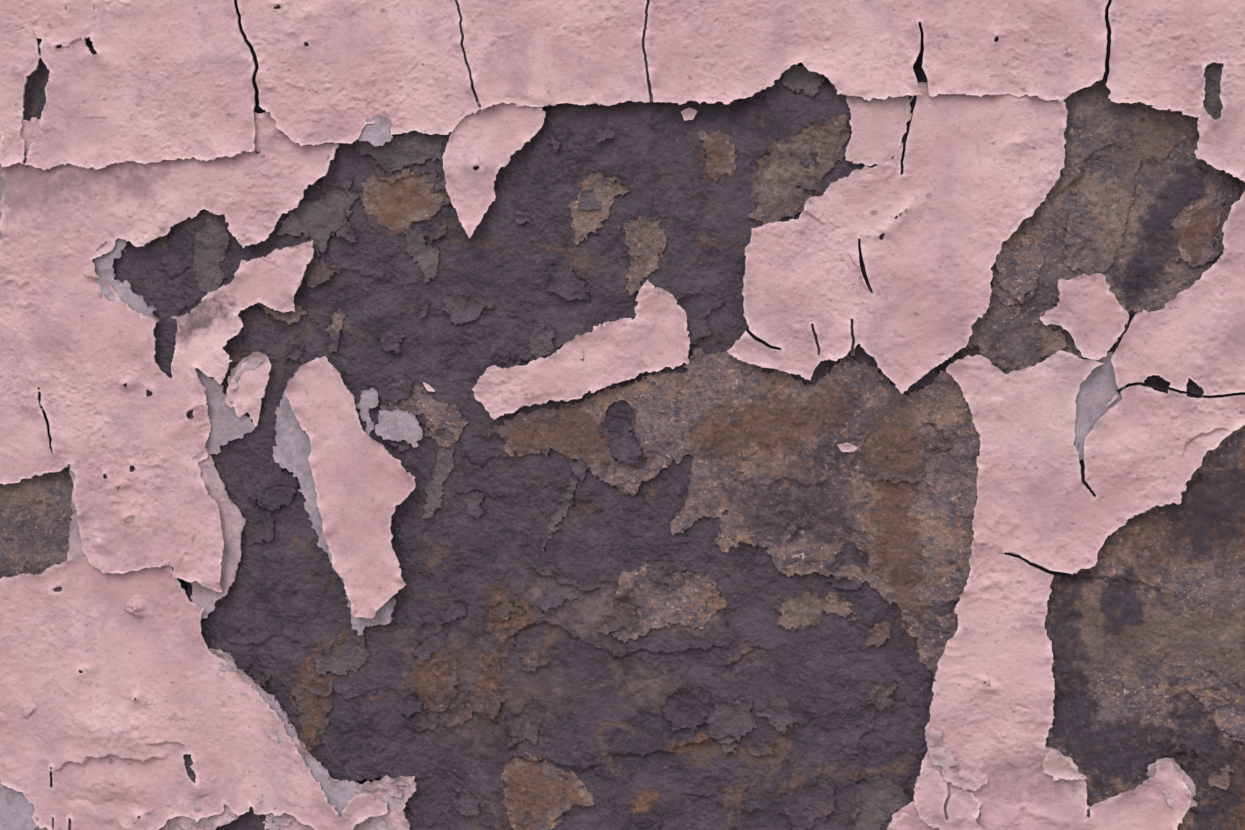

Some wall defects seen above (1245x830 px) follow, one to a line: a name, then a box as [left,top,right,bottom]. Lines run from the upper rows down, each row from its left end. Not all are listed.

spalling [23,38,50,121]
crack [236,3,262,114]
crack [642,0,653,102]
crack [900,24,928,174]
crack [1101,0,1112,83]
spalling [1203,59,1227,120]
peeling [967,80,1245,461]
crack [1116,382,1245,398]
peeling [93,63,988,830]
peeling [0,464,85,579]
crack [1005,552,1071,577]
peeling [1045,425,1245,830]